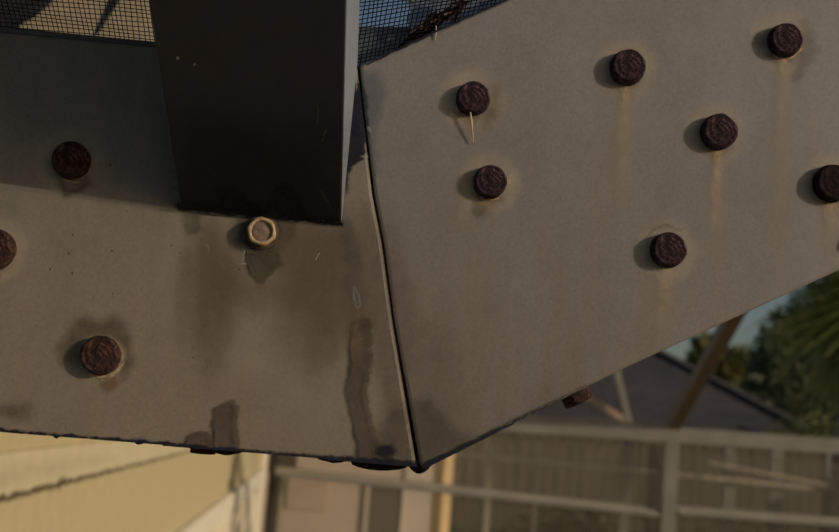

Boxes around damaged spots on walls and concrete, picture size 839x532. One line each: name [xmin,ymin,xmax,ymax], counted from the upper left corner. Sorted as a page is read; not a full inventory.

damp [240,218,296,283]
damp [347,318,412,461]
damp [0,400,240,501]